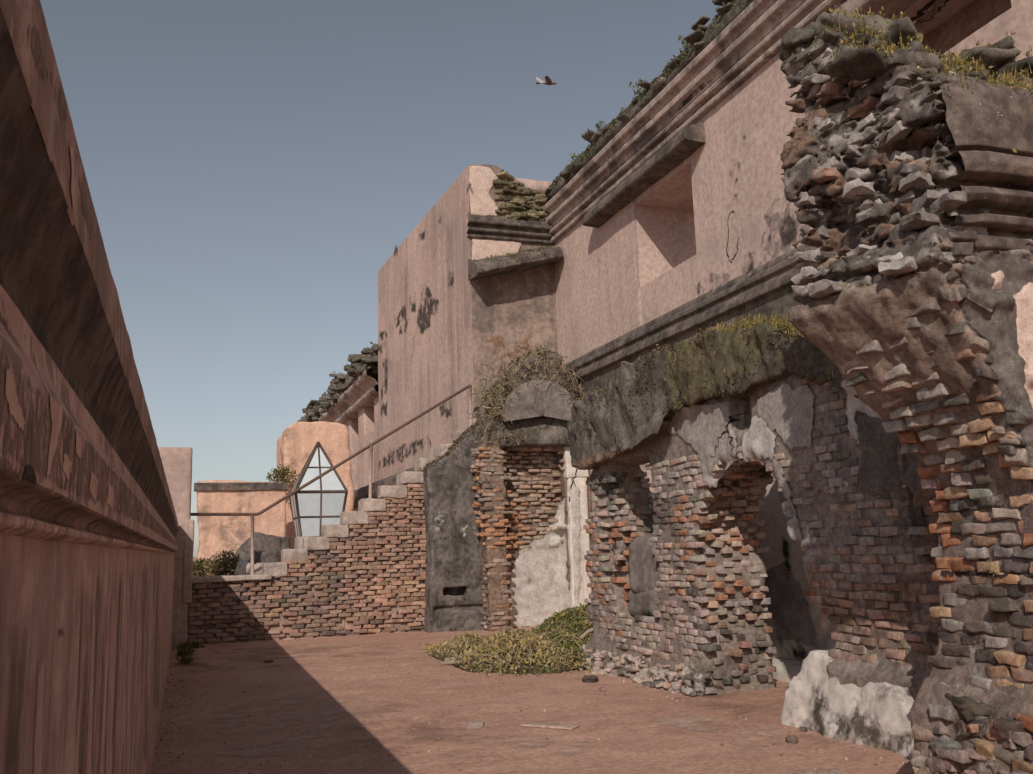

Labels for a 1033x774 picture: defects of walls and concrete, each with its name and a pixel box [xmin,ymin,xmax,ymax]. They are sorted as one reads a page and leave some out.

crack [910,0,950,25]
leakage [378,287,439,416]
crack [711,411,748,465]